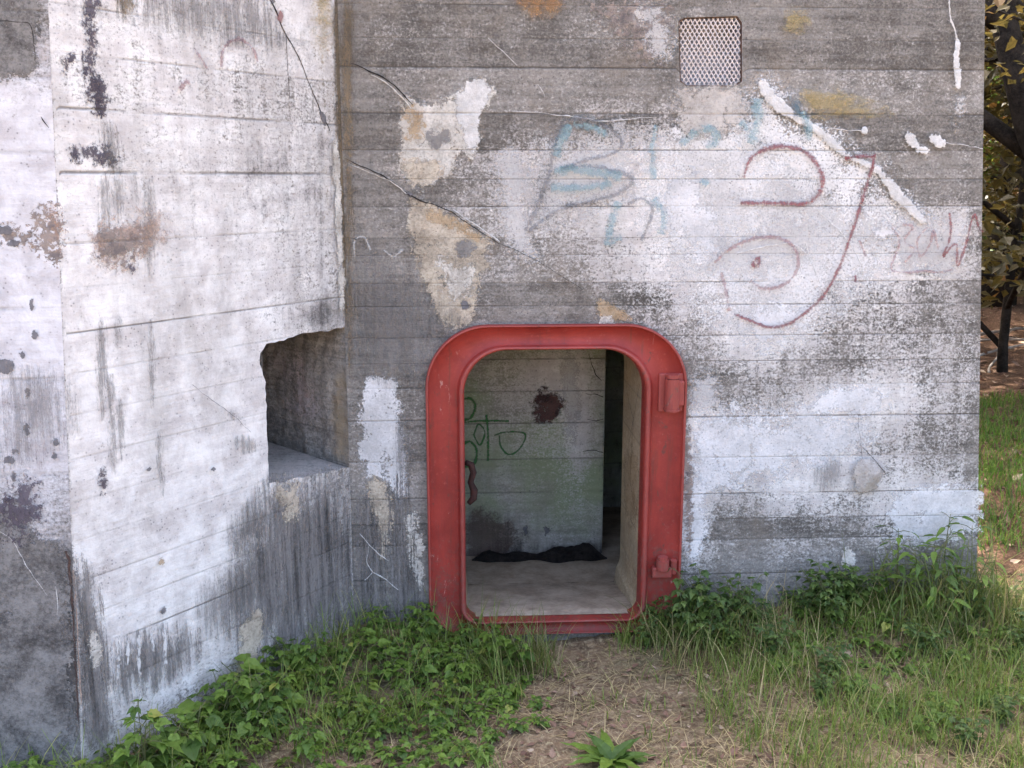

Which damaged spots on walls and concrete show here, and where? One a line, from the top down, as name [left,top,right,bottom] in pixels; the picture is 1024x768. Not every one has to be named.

water stain [61,0,111,119]
water stain [66,141,121,167]
crack [270,0,330,131]
crack [351,63,413,109]
crack [345,158,583,290]
peeling [396,71,968,356]
water stain [758,79,926,224]
water stain [948,0,966,117]
corrosion [529,386,565,424]
peeling [357,376,426,591]
water stain [225,468,425,658]
water stain [69,553,202,751]